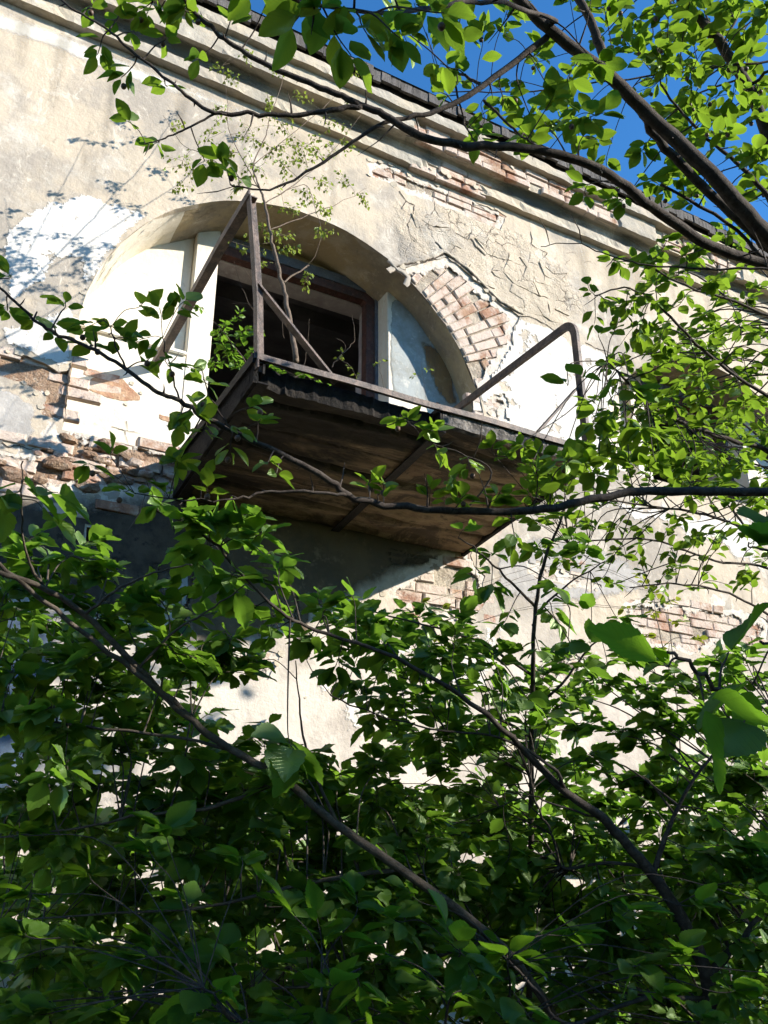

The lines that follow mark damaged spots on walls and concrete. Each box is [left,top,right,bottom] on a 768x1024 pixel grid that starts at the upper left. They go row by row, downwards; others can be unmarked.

crack [386,191,588,330]
spalling [367,125,625,451]
spalling [0,308,181,519]
spalling [623,594,768,656]